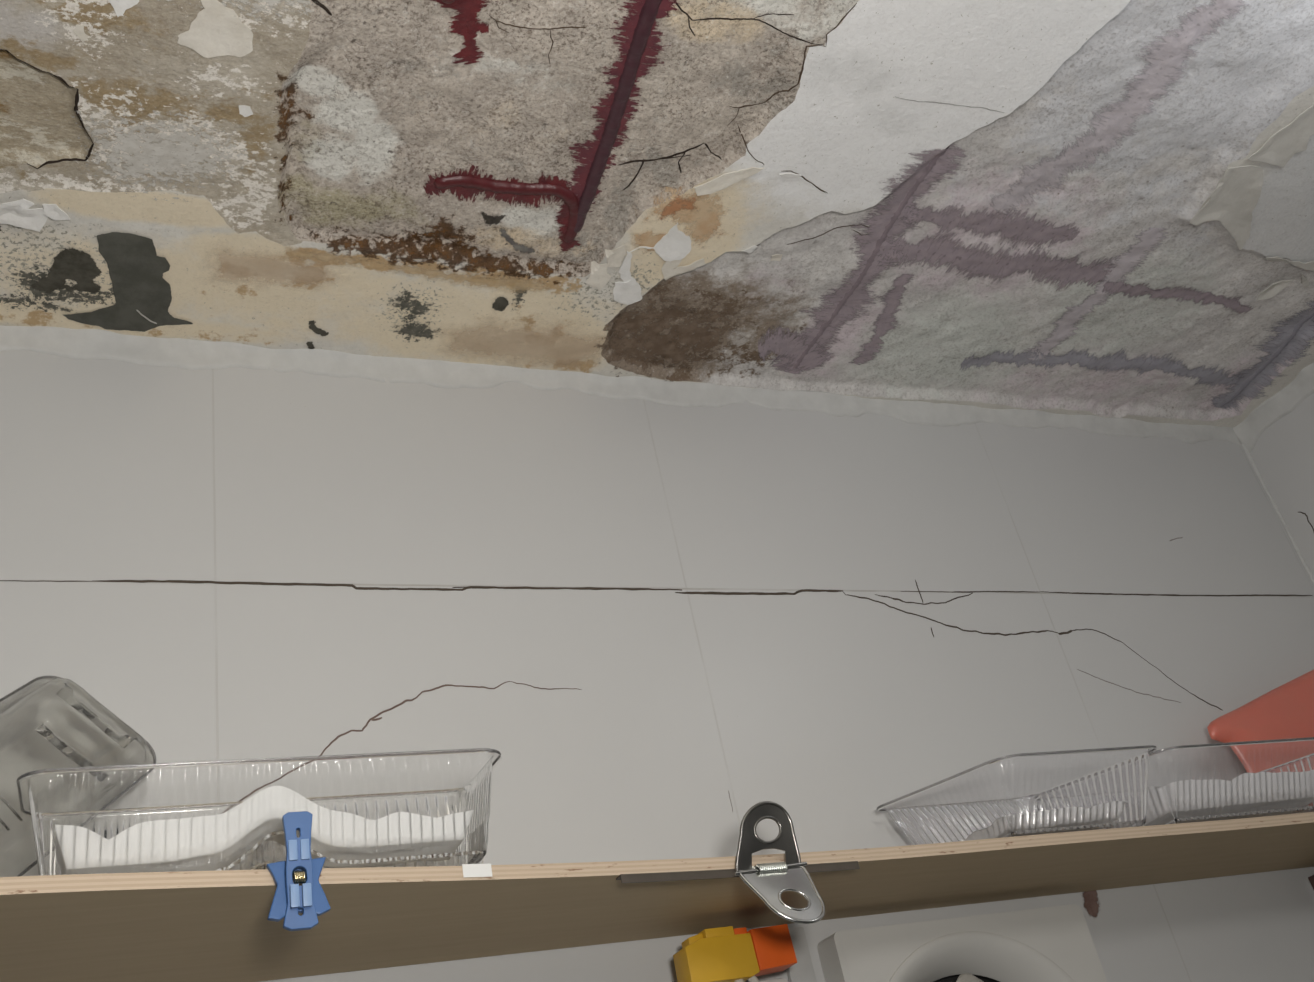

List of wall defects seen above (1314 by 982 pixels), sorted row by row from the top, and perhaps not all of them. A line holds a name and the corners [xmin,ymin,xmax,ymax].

crack [619,0,857,193]
spalling [0,0,1314,421]
crack [787,224,869,245]
mould [0,248,114,315]
water stain [306,320,329,349]
water stain [386,290,443,342]
water stain [492,288,527,311]
crack [0,580,1313,710]
crack [221,681,582,814]